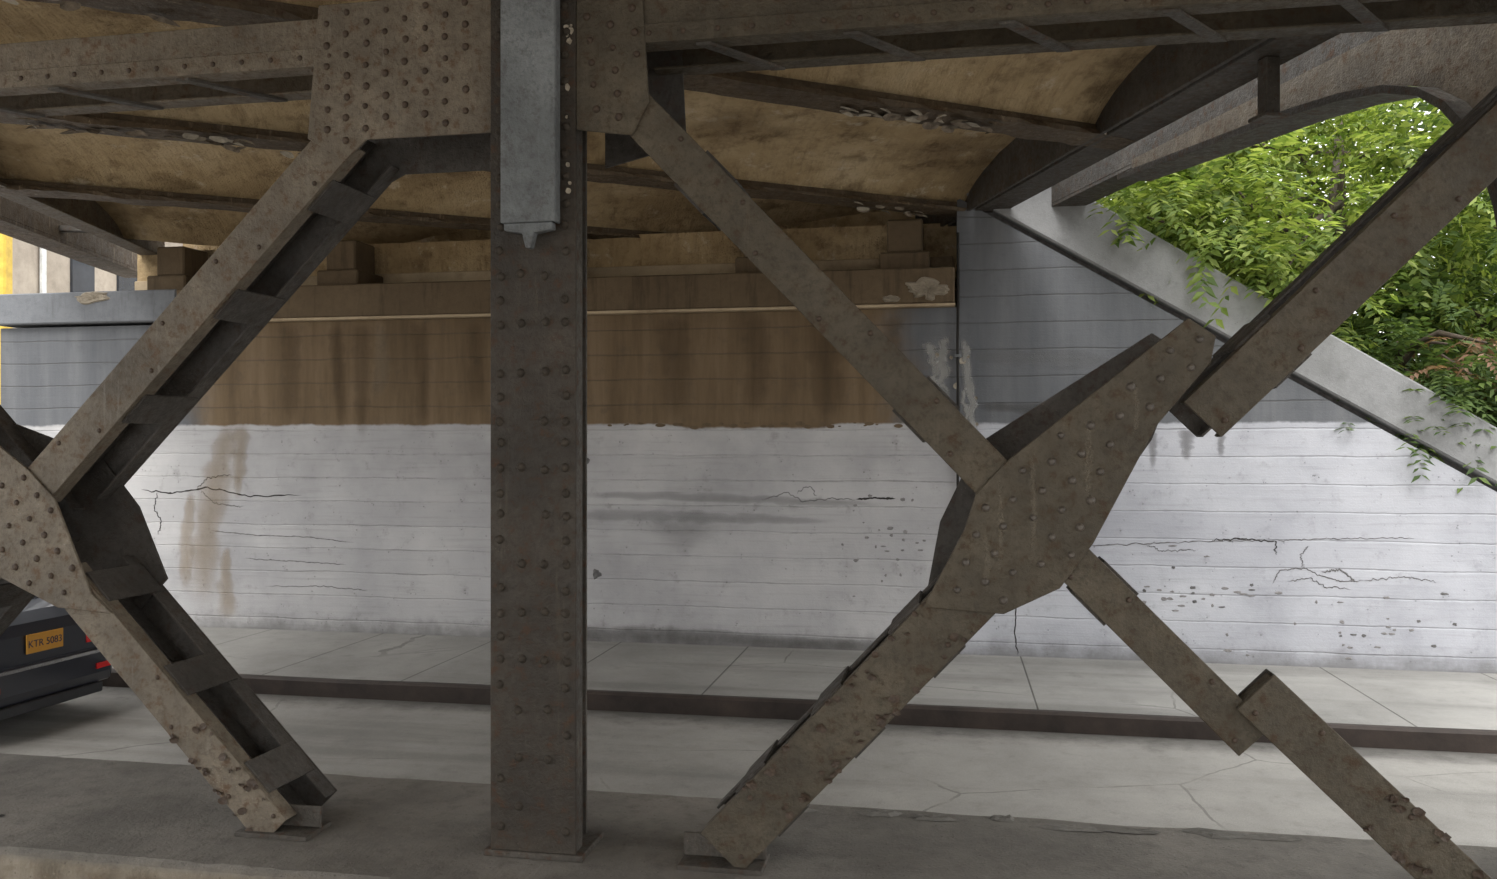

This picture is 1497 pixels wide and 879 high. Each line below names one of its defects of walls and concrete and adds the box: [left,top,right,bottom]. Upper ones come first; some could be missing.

peeling [840,106,1004,134]
water stain [927,339,978,427]
crack [146,474,365,591]
crack [1092,537,1436,589]